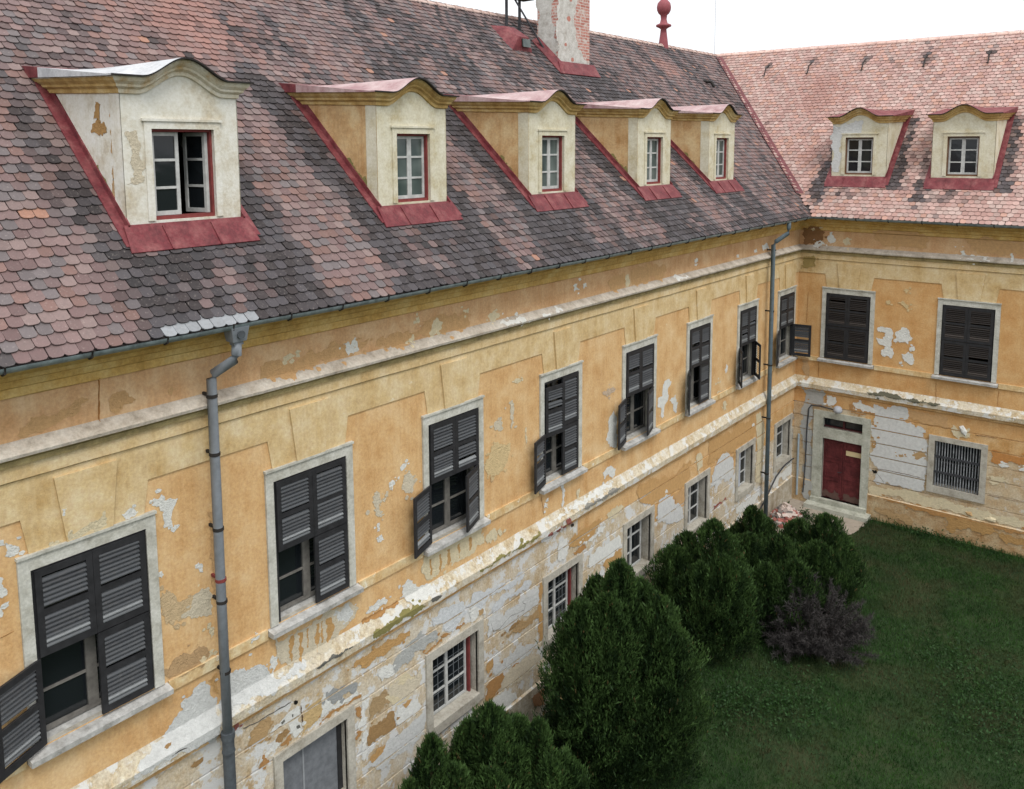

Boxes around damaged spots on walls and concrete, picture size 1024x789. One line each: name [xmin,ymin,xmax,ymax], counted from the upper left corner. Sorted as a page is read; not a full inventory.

flaking render [813,232,852,250]
flaking render [876,326,915,366]
flaking render [658,379,678,418]
flaking render [694,453,734,488]
spalling [714,380,837,514]
flaking render [853,400,1024,528]
flaking render [149,489,180,532]
flaking render [366,459,421,542]
flaking render [656,489,684,524]
flaking render [134,528,506,779]
flaking render [321,568,540,773]